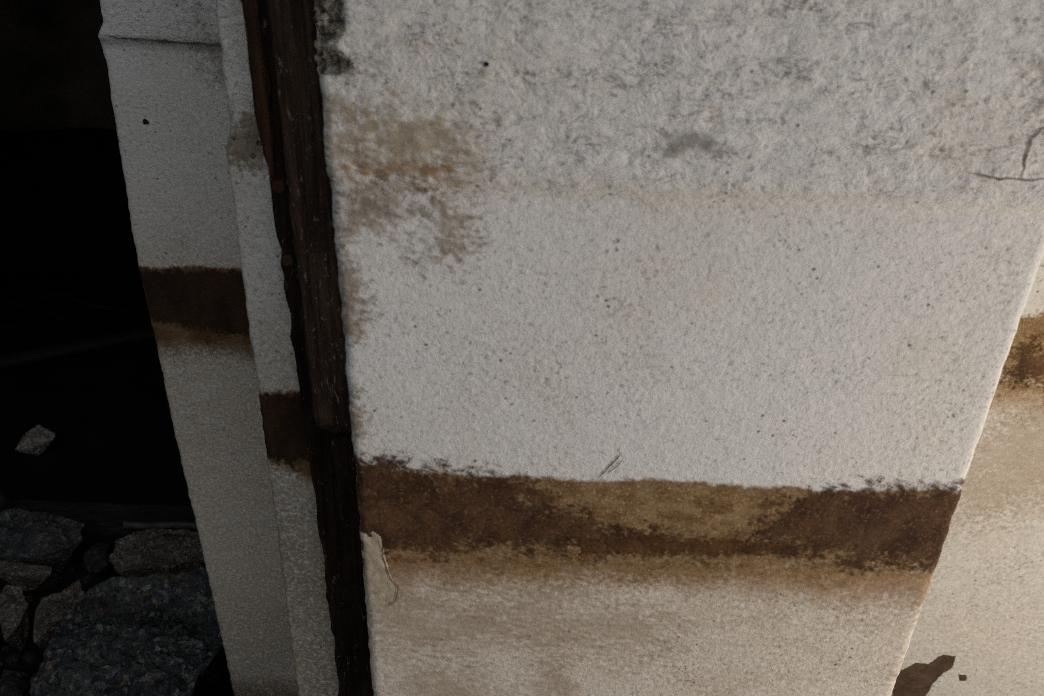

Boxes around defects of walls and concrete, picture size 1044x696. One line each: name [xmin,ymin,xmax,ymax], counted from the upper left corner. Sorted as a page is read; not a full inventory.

leakage [138,265,254,357]
leakage [993,313,1044,406]
leakage [259,391,312,481]
leakage [354,451,965,598]
peeling [892,655,967,696]